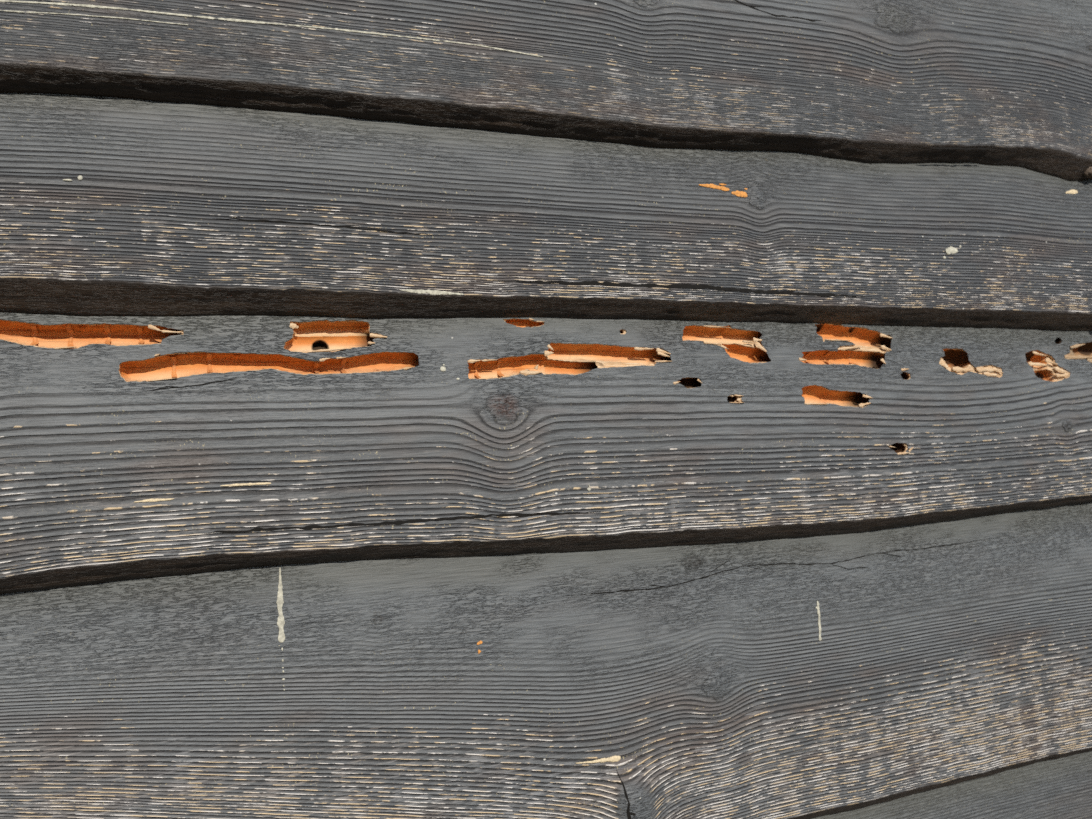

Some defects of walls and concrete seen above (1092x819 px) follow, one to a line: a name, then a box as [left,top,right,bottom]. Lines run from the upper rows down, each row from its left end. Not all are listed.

crack [616,769,636,819]